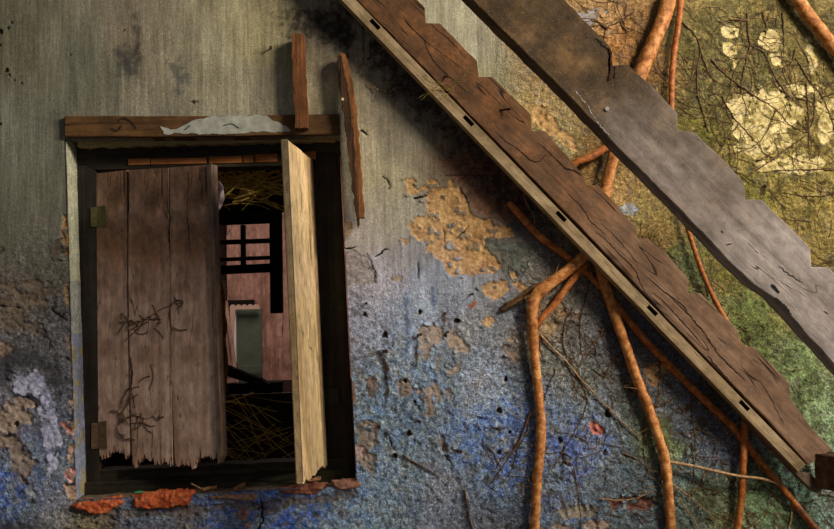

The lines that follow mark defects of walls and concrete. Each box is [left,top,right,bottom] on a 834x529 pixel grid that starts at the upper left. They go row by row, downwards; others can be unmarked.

spalling [59,215,69,257]
spalling [399,151,532,301]
spalling [367,376,380,403]
spalling [396,309,471,419]
spalling [0,396,40,500]
spalling [60,398,361,528]
spalling [355,419,381,478]
spalling [438,435,458,453]
crack [257,498,265,529]